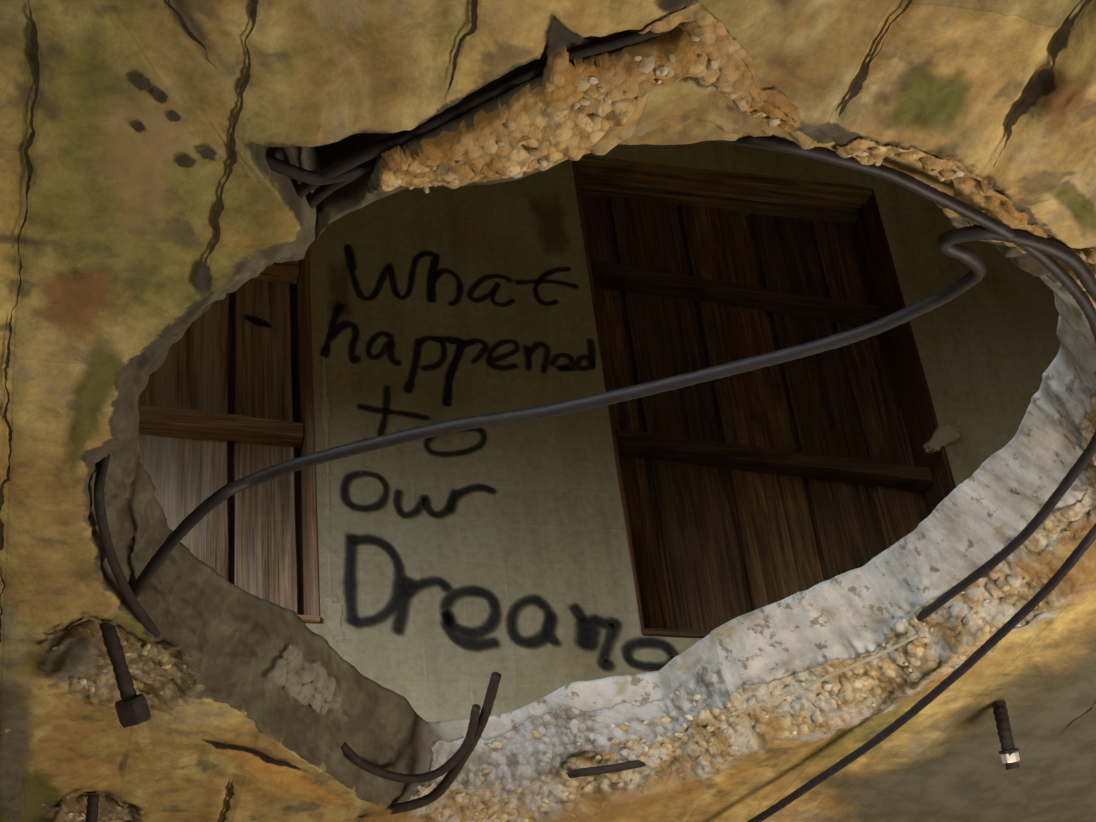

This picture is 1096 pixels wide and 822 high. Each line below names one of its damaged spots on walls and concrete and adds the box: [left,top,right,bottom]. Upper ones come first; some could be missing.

spalling [132,121,147,132]
spalling [132,75,182,122]
crack [165,0,258,263]
crack [445,0,478,99]
spalling [265,0,801,209]
crack [838,0,912,117]
crack [993,0,1091,167]
crack [0,0,40,642]
spalling [38,136,1096,715]
spalling [341,394,1096,822]
spalling [42,791,145,822]